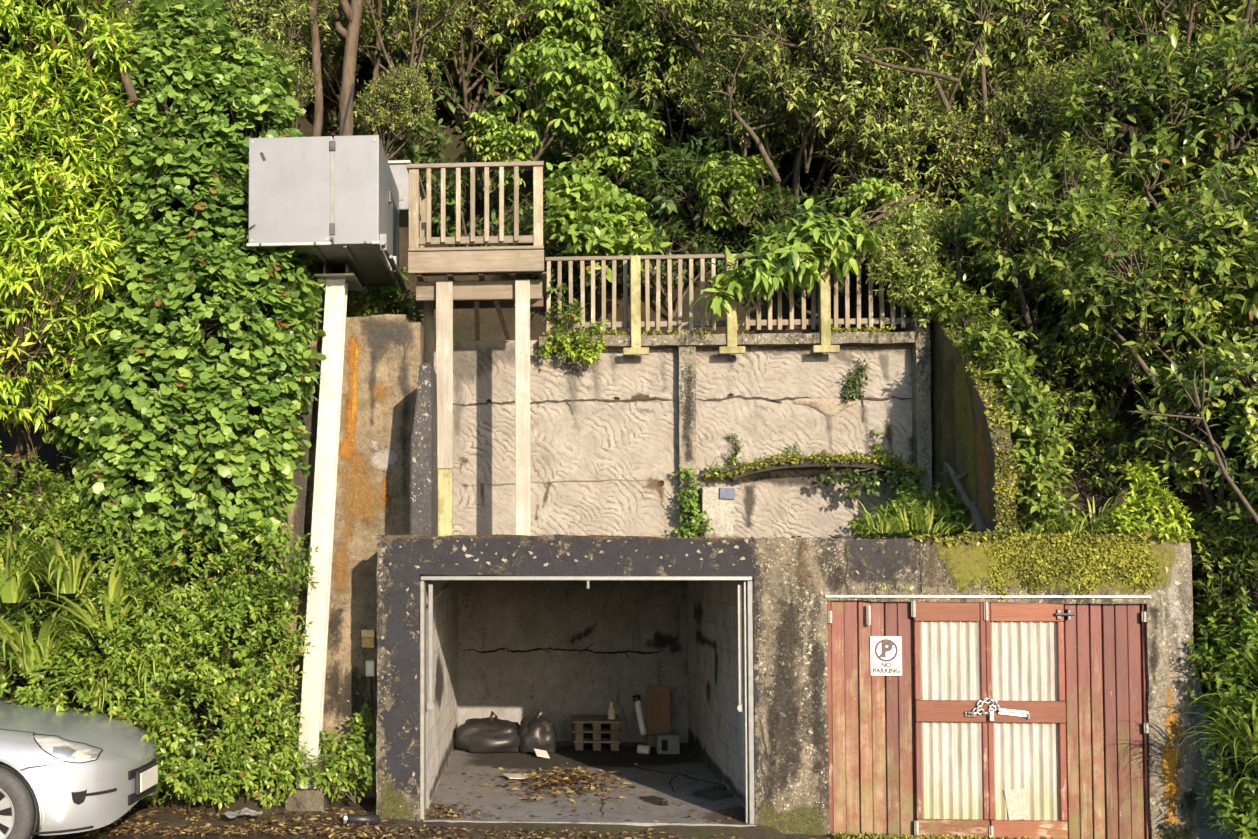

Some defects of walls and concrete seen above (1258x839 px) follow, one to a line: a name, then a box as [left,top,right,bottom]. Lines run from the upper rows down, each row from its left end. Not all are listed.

corrosion [334,337,390,591]
crack [453,394,912,422]
water stain [931,347,978,504]
water stain [797,541,809,591]
water stain [827,568,844,592]
crack [462,642,667,658]
water stain [765,598,826,798]
corrosion [1162,688,1182,824]